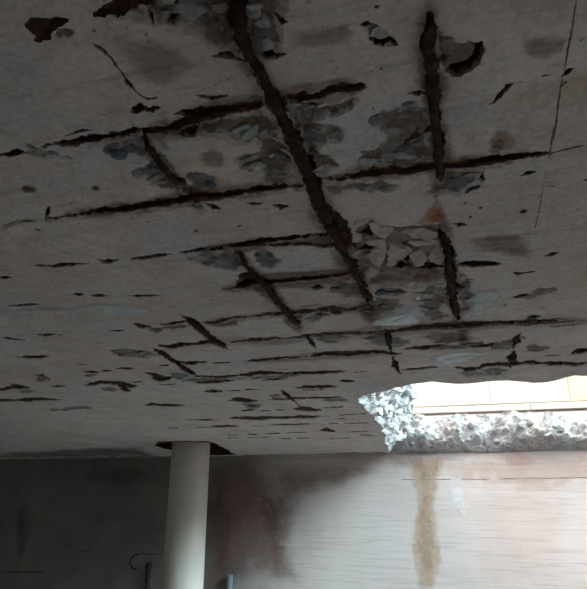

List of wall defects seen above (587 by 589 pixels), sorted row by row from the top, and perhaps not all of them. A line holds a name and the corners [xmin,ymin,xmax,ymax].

crack [541,0,577,158]
crack [489,81,524,106]
spalling [0,0,584,351]
crack [254,241,336,249]
crack [359,224,374,250]
crack [395,242,443,269]
crack [74,291,107,299]
crack [18,353,50,361]
crack [0,374,66,402]
crack [77,302,587,455]
spalling [358,384,587,454]
spalling [155,441,237,455]